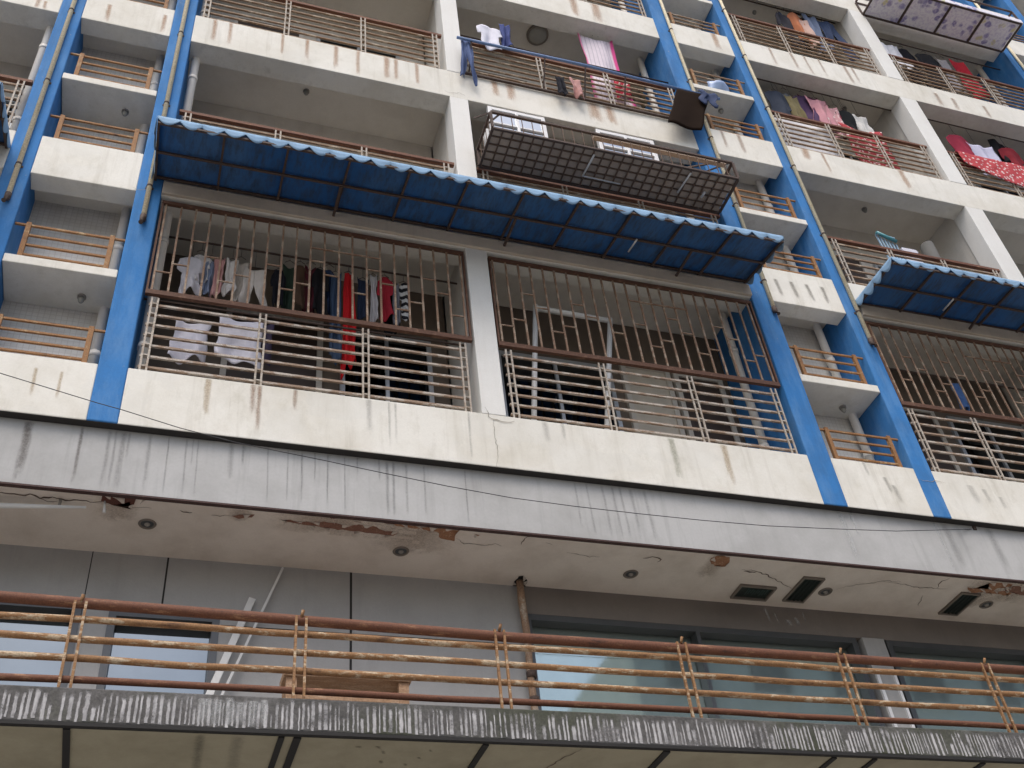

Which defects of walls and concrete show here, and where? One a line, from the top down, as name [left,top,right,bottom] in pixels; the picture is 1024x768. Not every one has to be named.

crack [0,492,148,508]
peeling [101,496,146,513]
peeling [280,518,460,541]
peeling [968,583,1024,597]